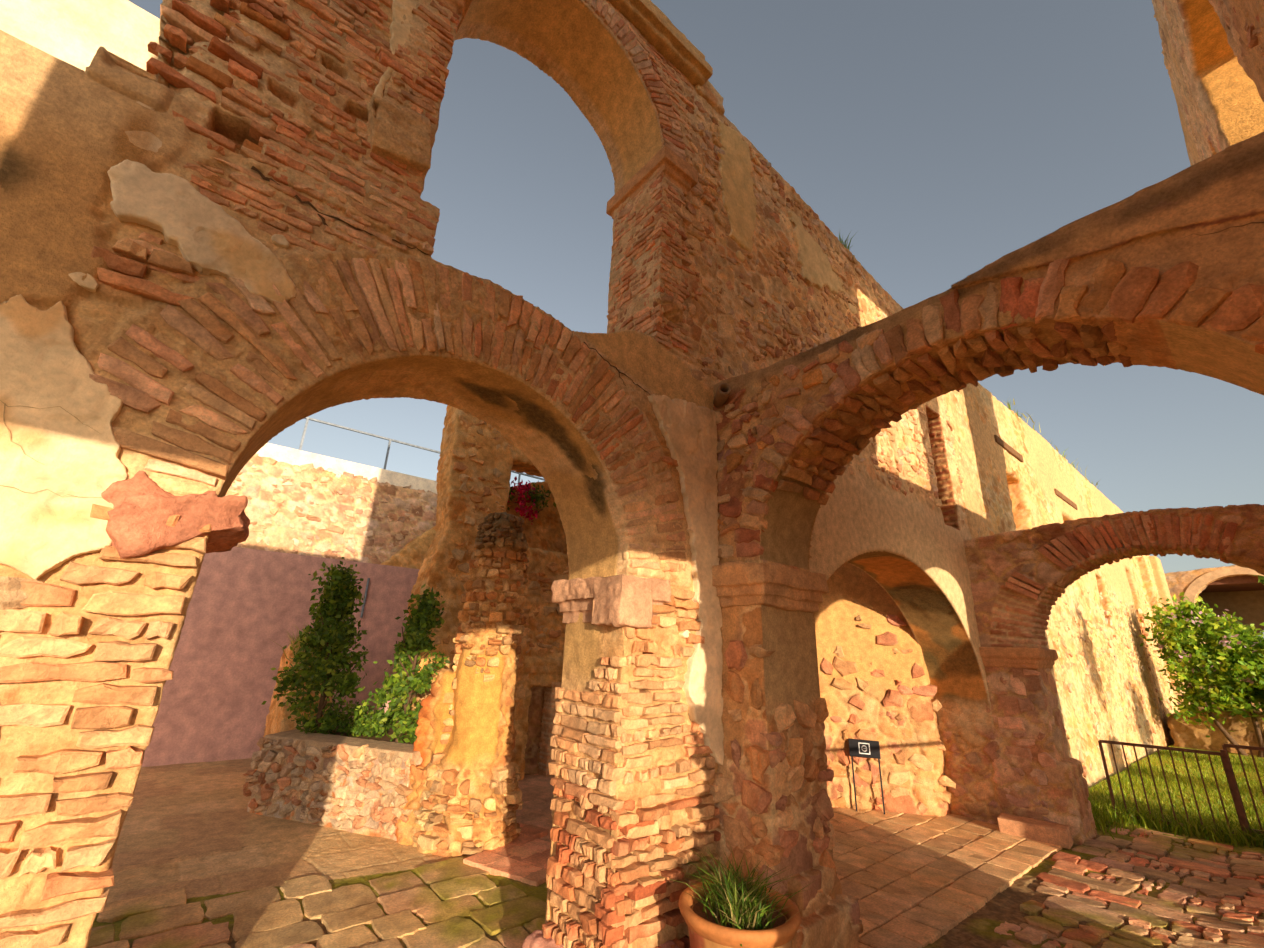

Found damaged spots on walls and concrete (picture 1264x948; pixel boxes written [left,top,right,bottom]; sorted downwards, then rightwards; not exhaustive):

flaking render [68,272,99,292]
crack [0,400,102,498]
flaking render [0,294,128,579]